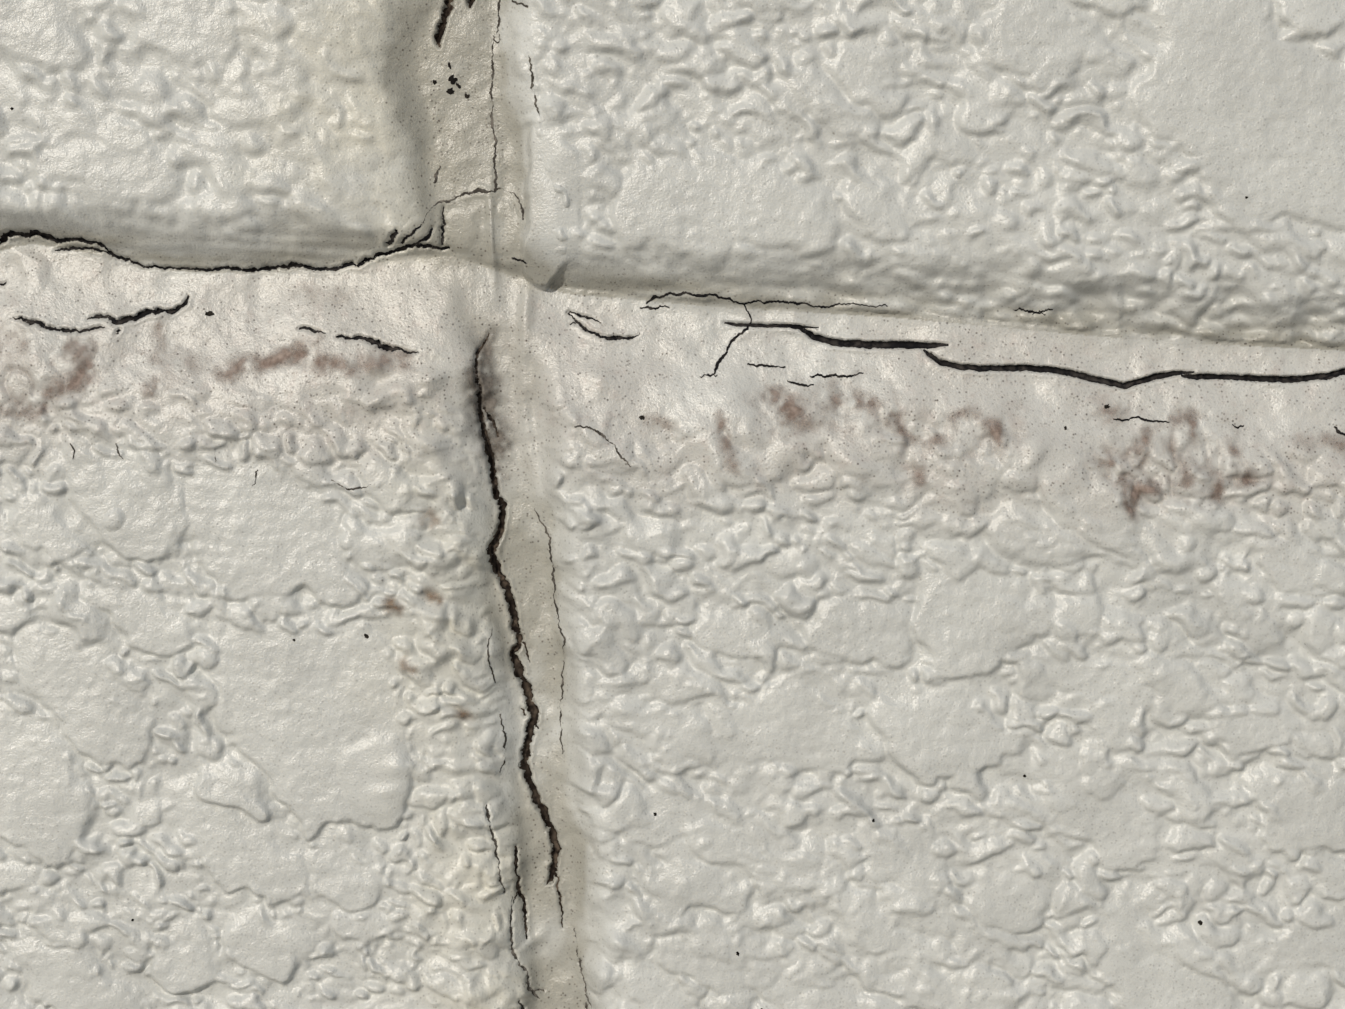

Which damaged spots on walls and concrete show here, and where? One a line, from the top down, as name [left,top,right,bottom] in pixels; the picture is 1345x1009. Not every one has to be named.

crack [528,55,539,114]
crack [0,0,528,334]
crack [273,326,418,354]
crack [568,291,1345,423]
crack [474,333,592,1009]